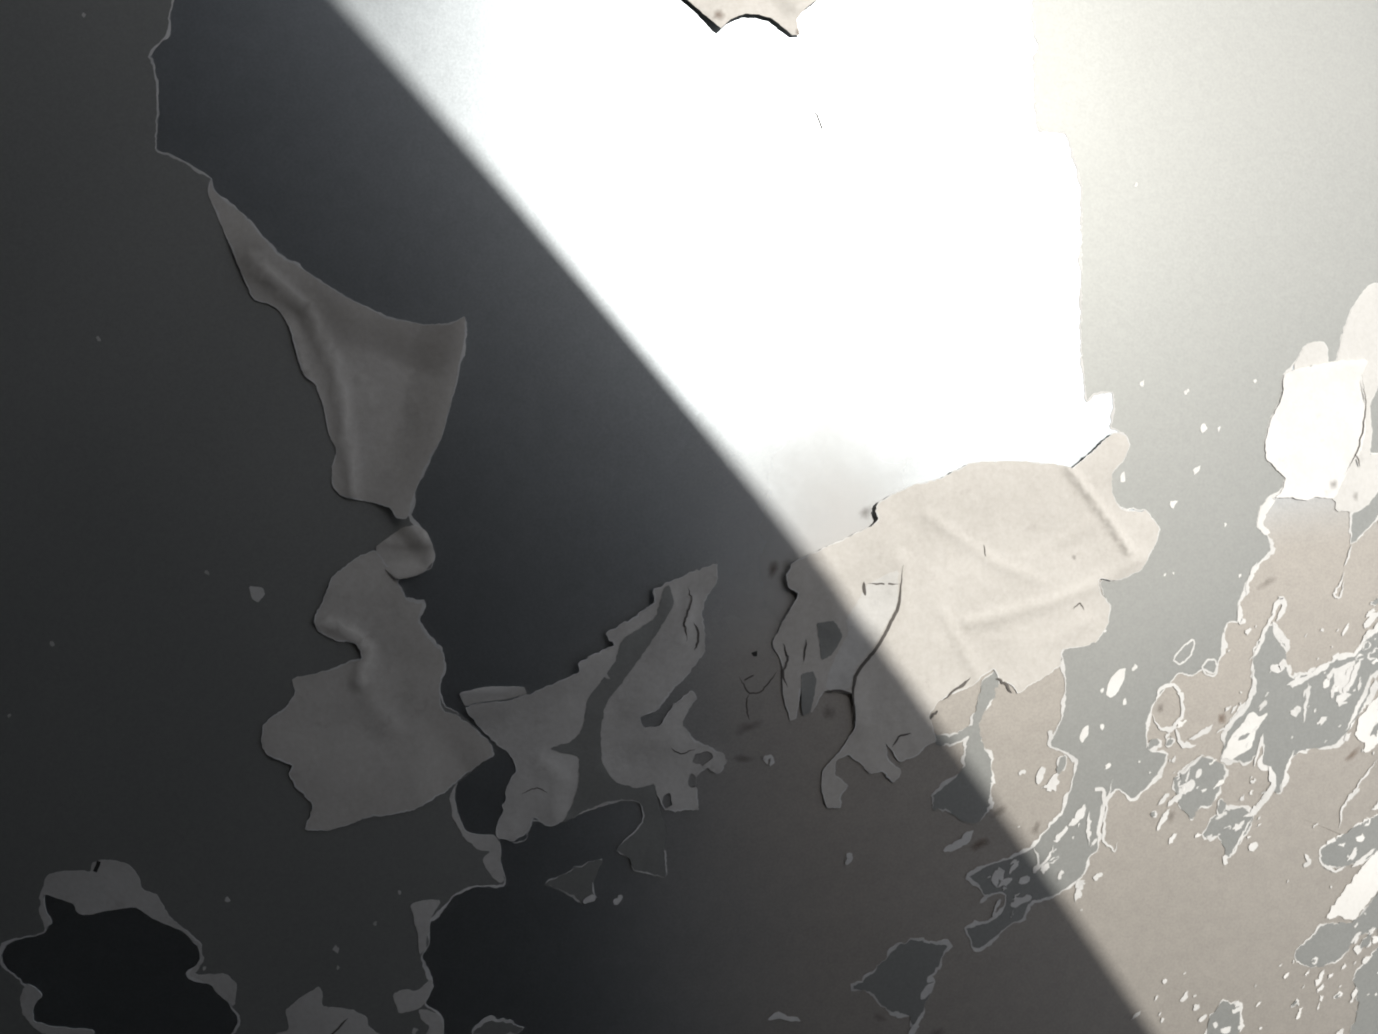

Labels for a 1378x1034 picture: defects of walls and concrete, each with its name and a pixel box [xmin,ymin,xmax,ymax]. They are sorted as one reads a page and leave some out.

peeling [0,860,241,1034]
peeling [277,987,379,1034]
peeling [148,0,1160,877]
peeling [393,283,1378,1034]